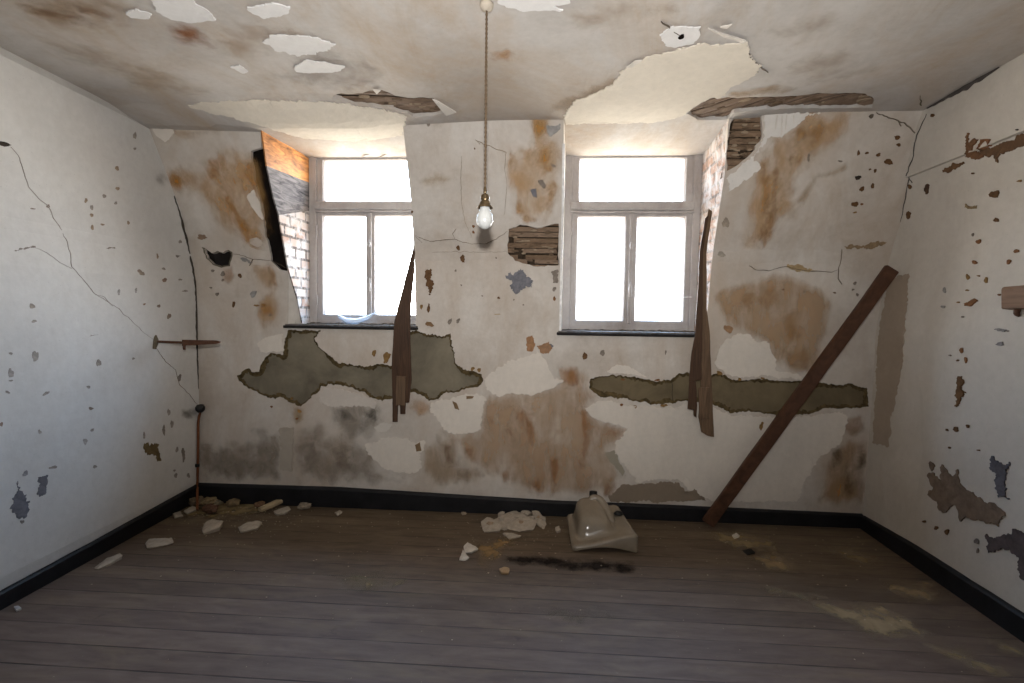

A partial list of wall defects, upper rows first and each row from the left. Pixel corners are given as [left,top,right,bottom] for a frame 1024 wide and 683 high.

peeling [188,89,456,157]
peeling [546,24,874,191]
crack [876,67,1000,222]
crack [11,147,199,405]
spalling [237,320,392,420]
spalling [410,269,564,434]
spalling [495,224,559,306]
leakage [464,371,614,490]
peeling [585,325,802,504]
leakage [720,280,828,365]
peeling [732,274,910,503]
peeling [927,450,1024,580]